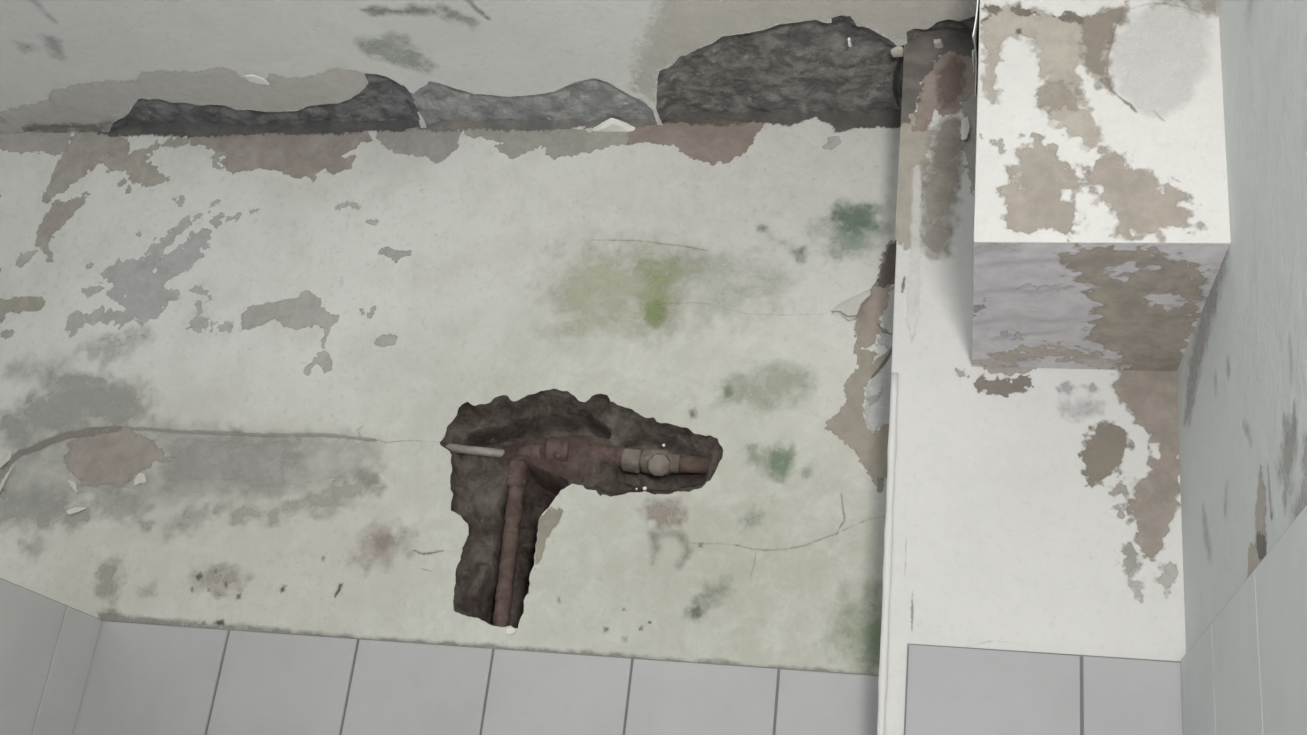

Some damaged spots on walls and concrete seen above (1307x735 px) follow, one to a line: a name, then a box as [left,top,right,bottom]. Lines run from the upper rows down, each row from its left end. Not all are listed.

spalling [0,0,1128,492]
peeling [66,480,86,515]
spalling [440,389,723,635]